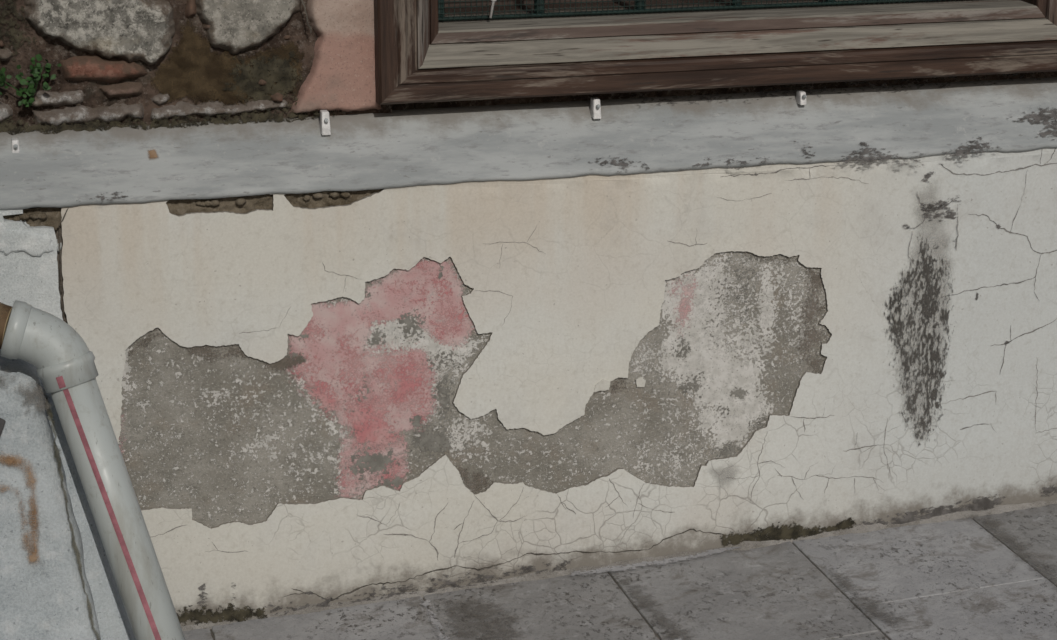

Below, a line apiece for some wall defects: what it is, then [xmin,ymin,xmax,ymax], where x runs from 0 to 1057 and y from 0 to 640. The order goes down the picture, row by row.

spalling [166,189,382,216]
damp [836,142,934,182]
crack [935,148,1057,300]
flaking render [118,251,831,527]
damp [884,194,961,446]
crack [942,320,1055,404]
rust [0,455,38,562]
crack [284,479,729,603]
crack [726,419,894,499]